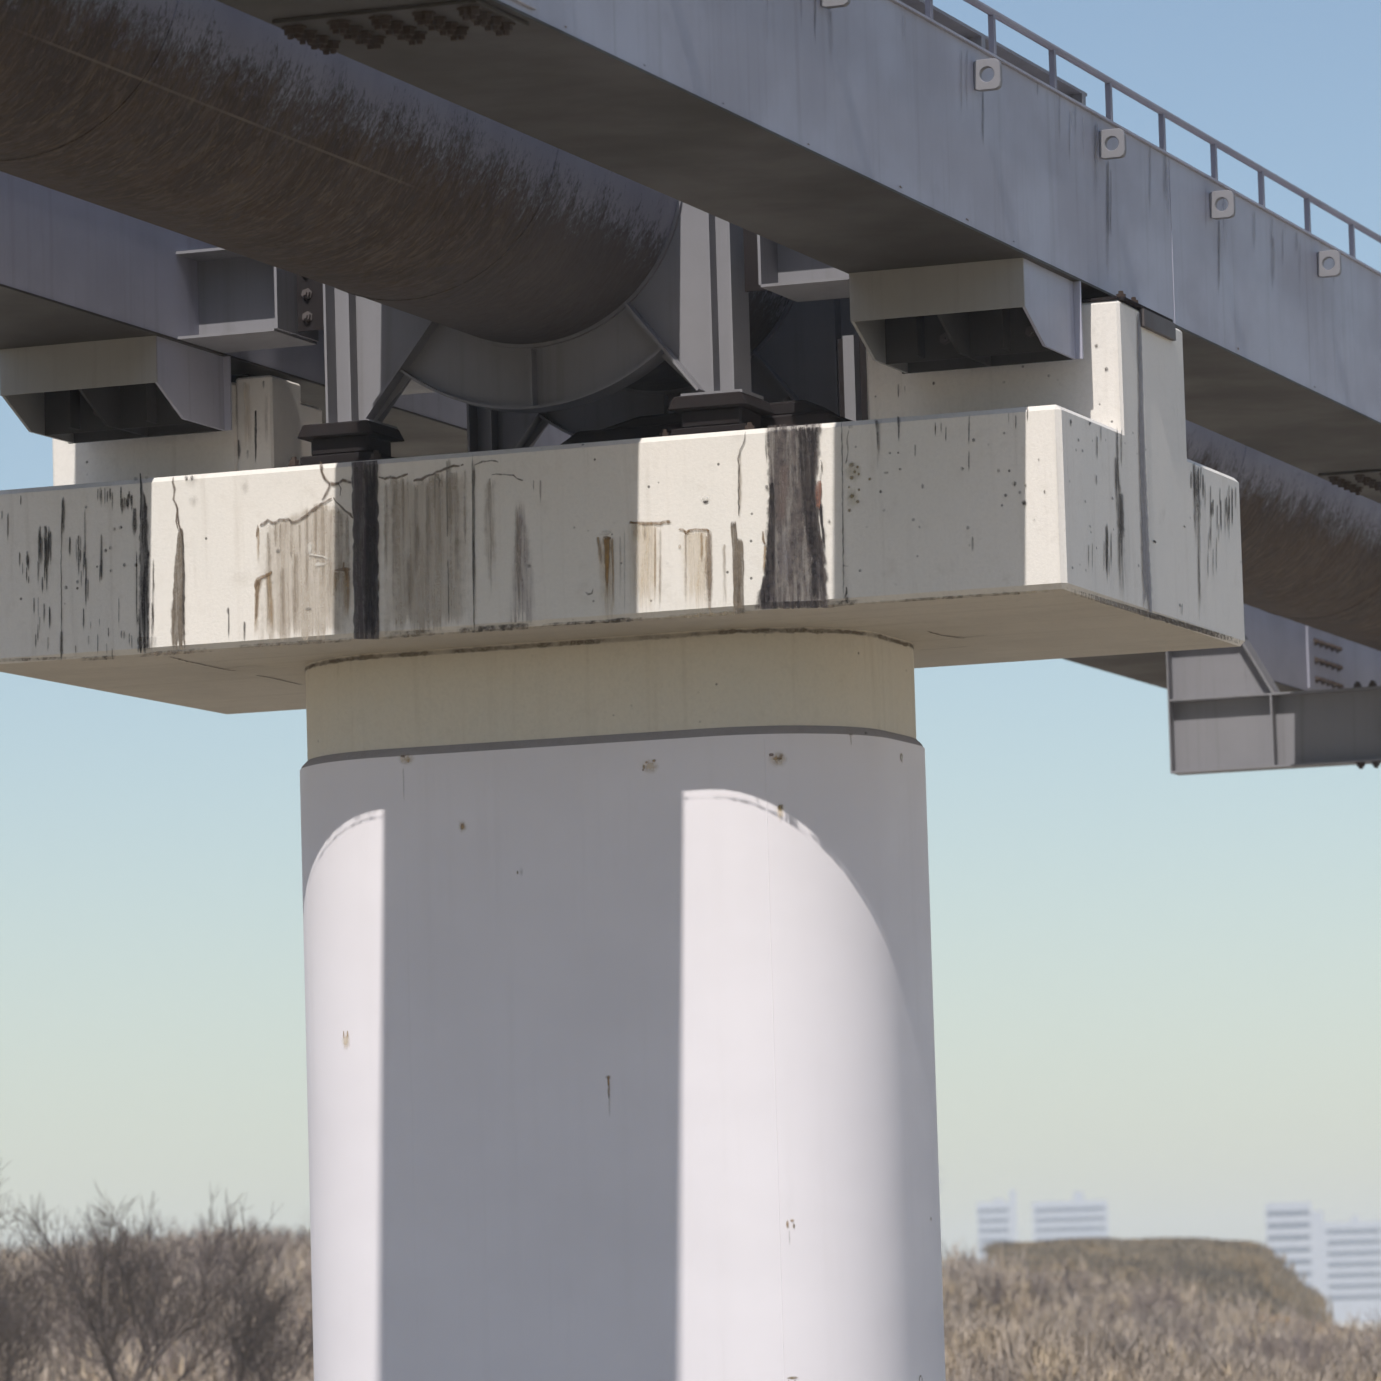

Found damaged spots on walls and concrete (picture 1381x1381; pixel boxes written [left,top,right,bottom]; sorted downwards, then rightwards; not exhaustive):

leakage [19,473,194,661]
rust [254,571,273,621]
rust [334,562,349,609]
leakage [258,460,454,670]
crack [256,460,523,627]
leakage [452,518,642,653]
rust [597,531,614,593]
rust [630,520,711,609]
leakage [684,423,914,648]
leakage [1191,466,1236,597]